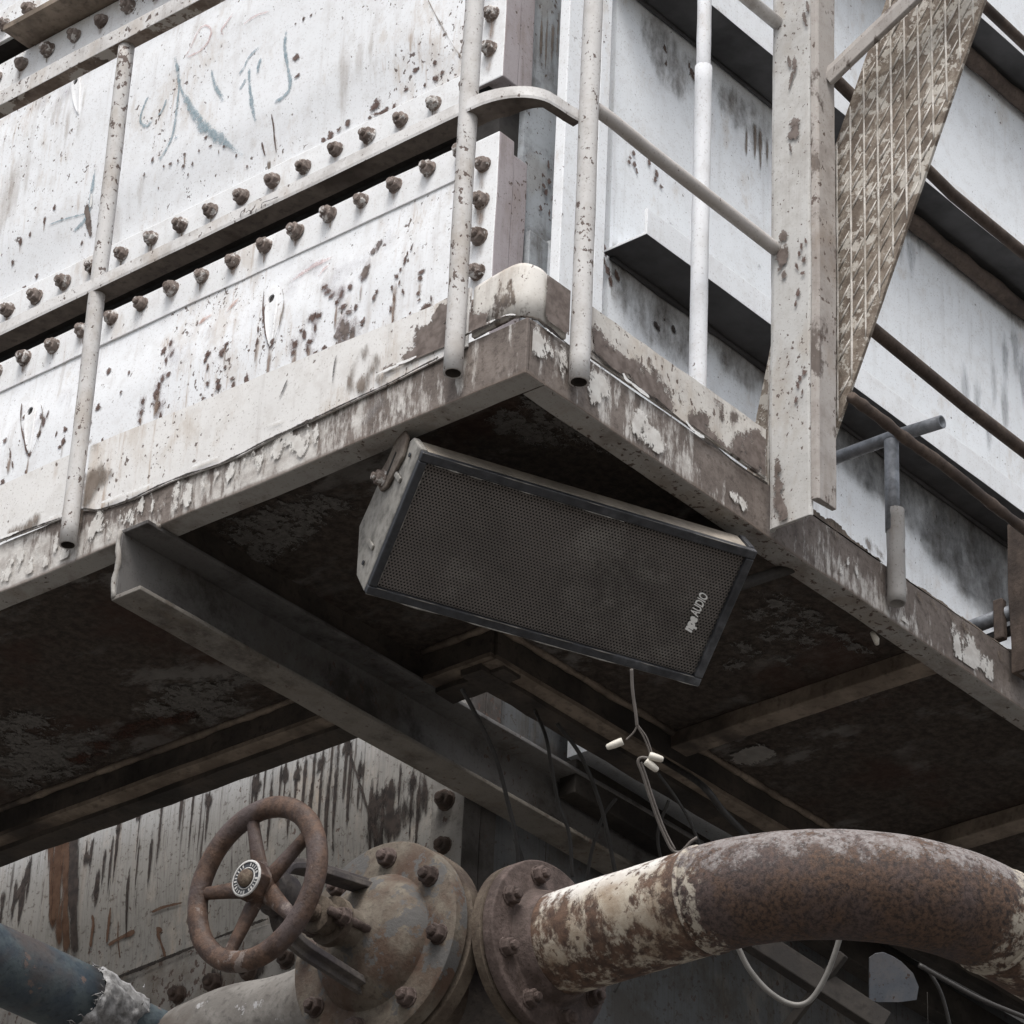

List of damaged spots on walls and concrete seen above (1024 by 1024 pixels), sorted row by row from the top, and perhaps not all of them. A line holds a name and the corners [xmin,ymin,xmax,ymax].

corrosion [775,230,807,278]
corrosion [201,341,249,401]
corrosion [254,290,284,373]
peeling [383,303,447,370]
peeling [532,275,571,377]
peeling [588,323,675,411]
peeling [86,423,319,542]
corrosion [47,839,79,953]
water stain [83,824,122,905]
water stain [125,808,163,933]
water stain [178,792,212,861]
water stain [251,741,420,851]